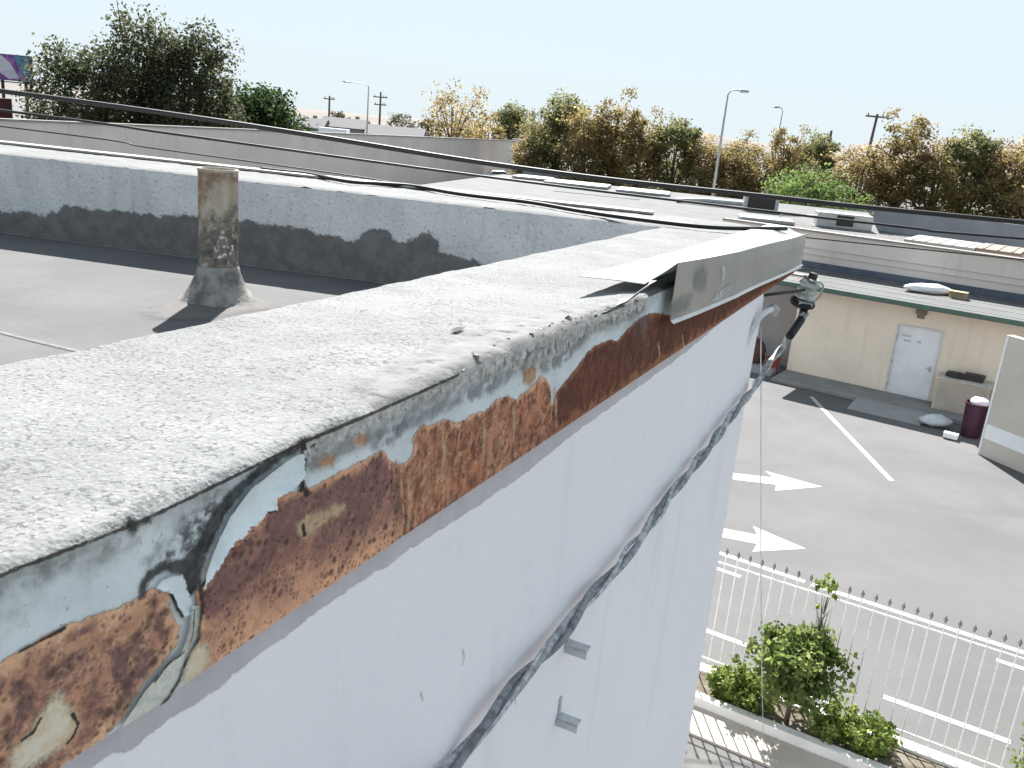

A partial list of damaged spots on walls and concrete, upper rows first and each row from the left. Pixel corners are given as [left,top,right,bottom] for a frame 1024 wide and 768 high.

water stain [0,204,198,258]
water stain [238,219,486,284]
flaking render [61,302,720,768]
rust [189,270,795,676]
rust [0,588,180,768]